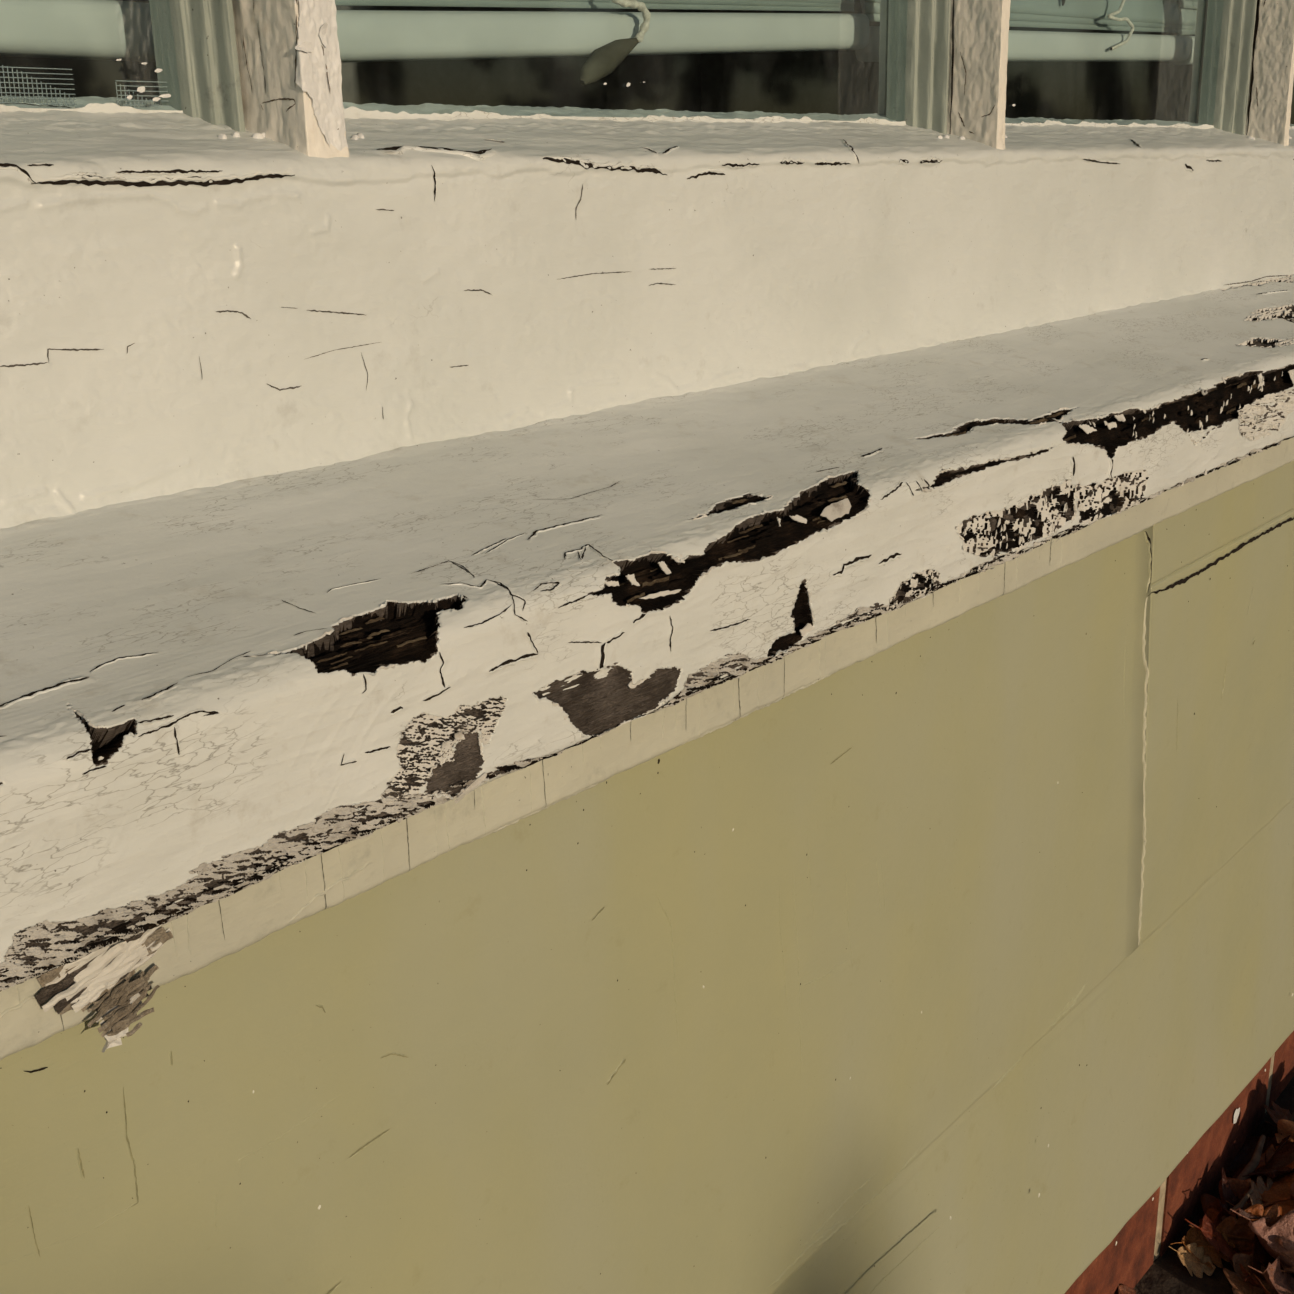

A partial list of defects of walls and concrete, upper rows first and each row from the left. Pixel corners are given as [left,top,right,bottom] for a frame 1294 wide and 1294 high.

peeling [295,0,348,151]
crack [0,343,134,367]
crack [267,307,384,420]
peeling [1236,304,1294,348]
crack [282,482,618,675]
crack [832,553,901,579]
crack [1144,517,1294,596]
crack [0,652,160,738]
crack [112,651,268,755]
crack [340,651,450,766]
crack [568,614,674,669]
peeling [0,369,1294,991]